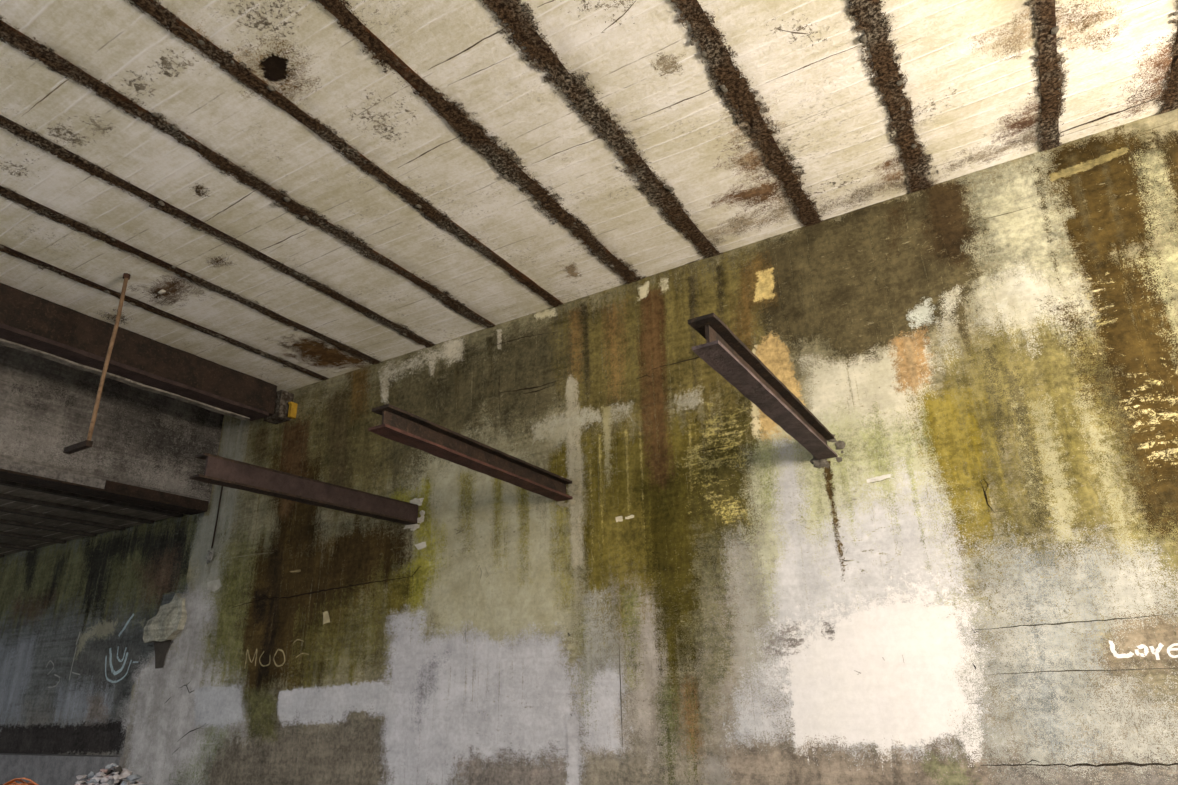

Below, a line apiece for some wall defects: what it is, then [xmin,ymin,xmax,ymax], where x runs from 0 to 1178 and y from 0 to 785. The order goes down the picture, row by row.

spalling [0,0,562,381]
spalling [315,0,646,285]
spalling [480,0,723,259]
spalling [671,0,823,226]
spalling [844,0,939,194]
spalling [1024,0,1070,152]
spalling [1153,0,1178,115]
corrosion [265,334,377,373]
corrosion [822,459,848,582]
crack [980,759,1178,767]